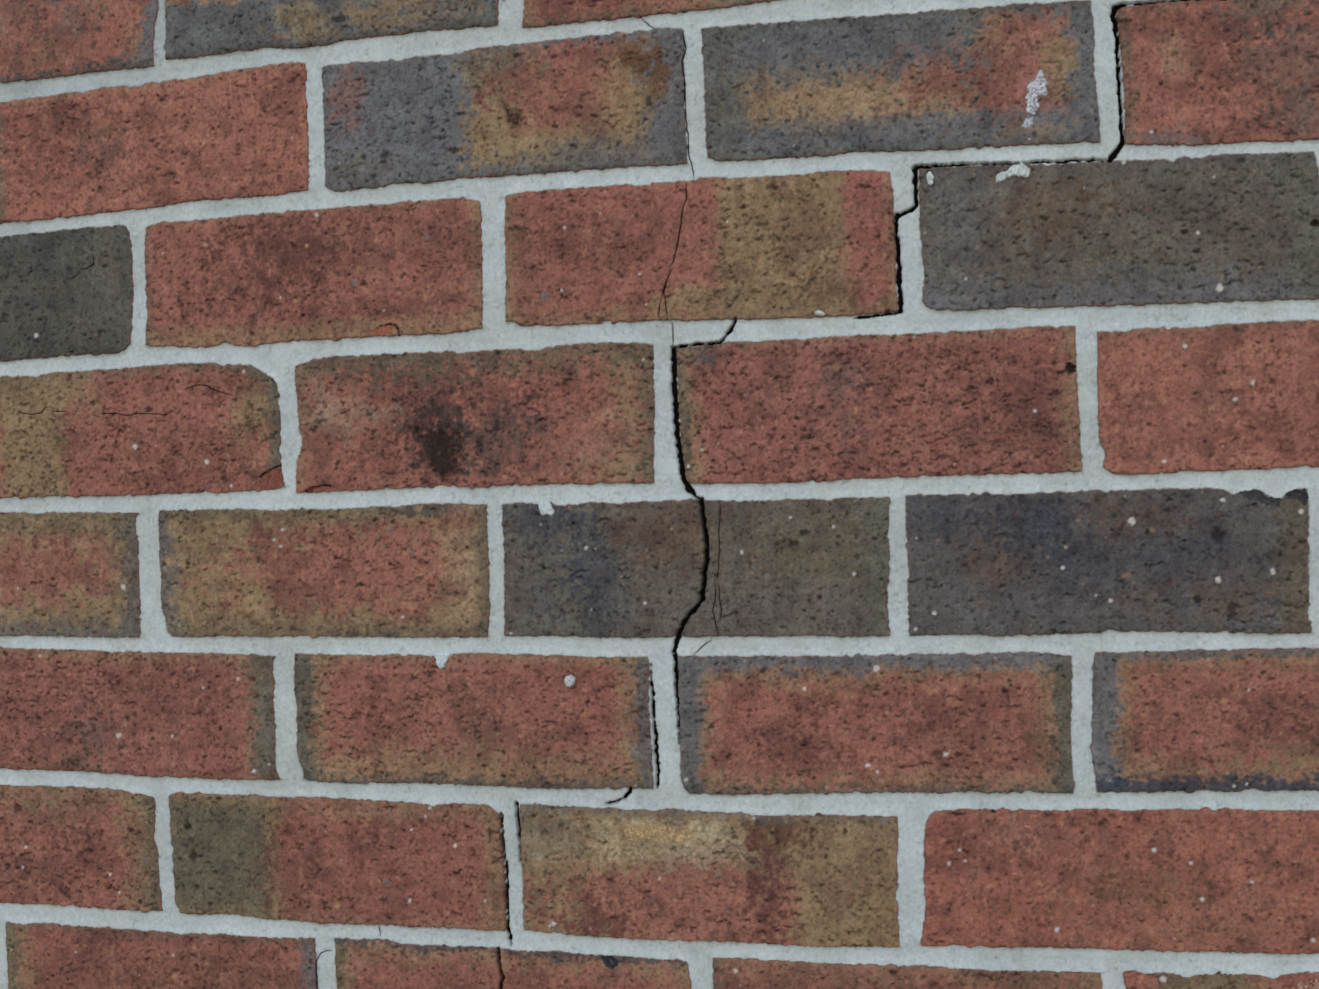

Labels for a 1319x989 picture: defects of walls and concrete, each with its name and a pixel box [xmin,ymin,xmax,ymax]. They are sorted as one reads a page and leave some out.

crack [857,0,1227,319]
crack [608,19,737,804]
crack [499,802,522,989]